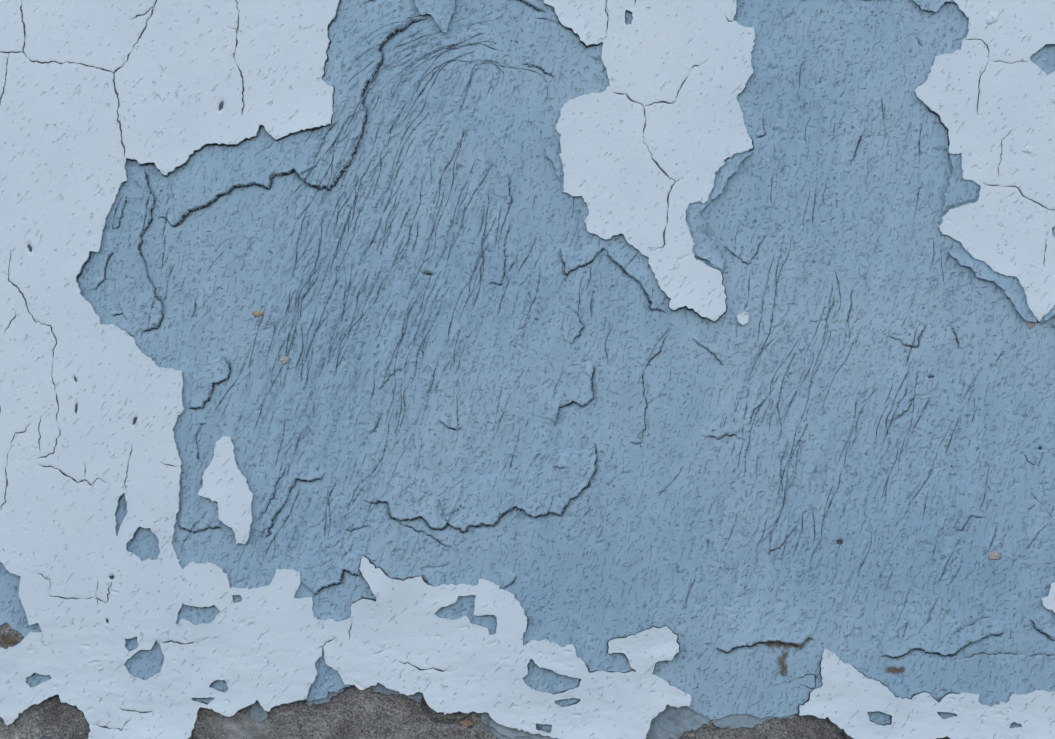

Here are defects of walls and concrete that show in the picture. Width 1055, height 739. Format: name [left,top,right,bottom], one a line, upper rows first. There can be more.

crack [0,0,157,154]
crack [232,0,244,113]
crack [966,39,1029,115]
crack [983,129,1055,211]
crack [0,253,132,510]
peeling [115,494,160,561]
peeling [0,562,42,647]
crack [37,573,112,605]
peeling [435,595,497,635]
peeling [124,637,164,680]
peeling [522,659,581,707]
peeling [645,704,774,739]